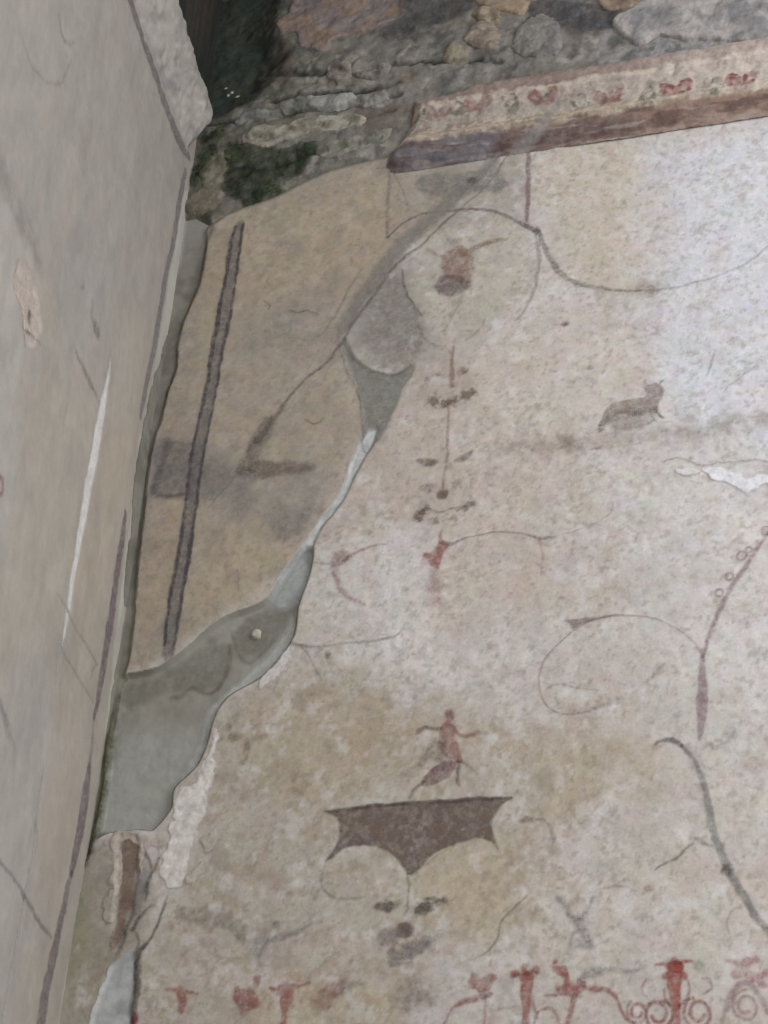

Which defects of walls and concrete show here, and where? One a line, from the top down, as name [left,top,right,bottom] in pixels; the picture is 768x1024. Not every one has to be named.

flaking render [85,0,727,923]
peeling [675,467,768,492]
flaking render [89,949,138,1024]